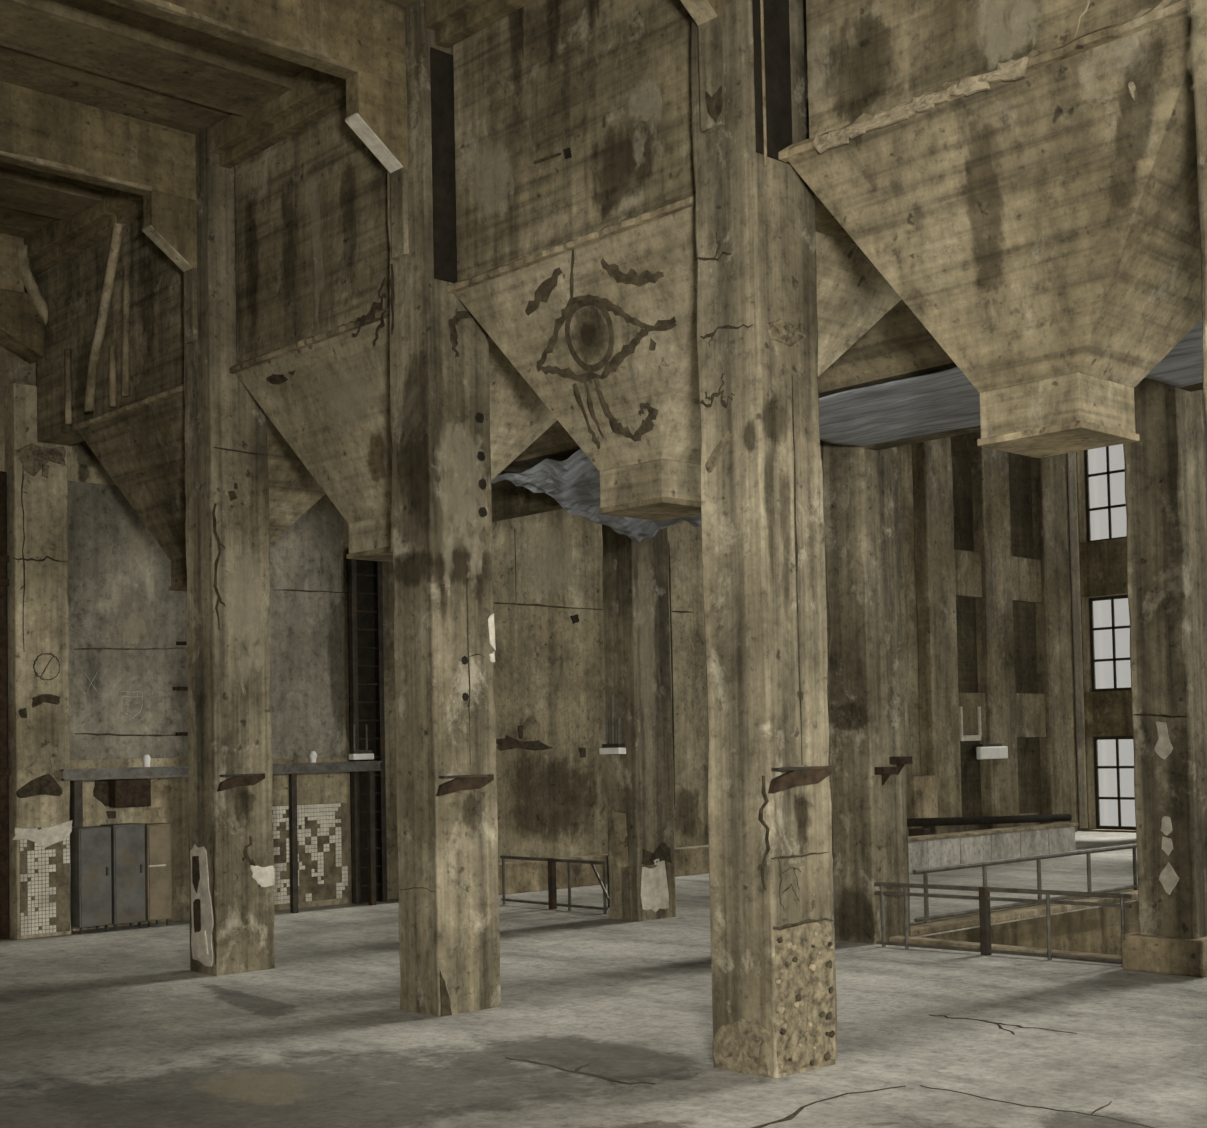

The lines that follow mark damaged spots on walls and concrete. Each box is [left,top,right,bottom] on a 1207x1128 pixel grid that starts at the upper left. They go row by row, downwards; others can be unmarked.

crack [758,776,833,930]
spalling [713,922,837,1076]
crack [751,1085,1154,1128]